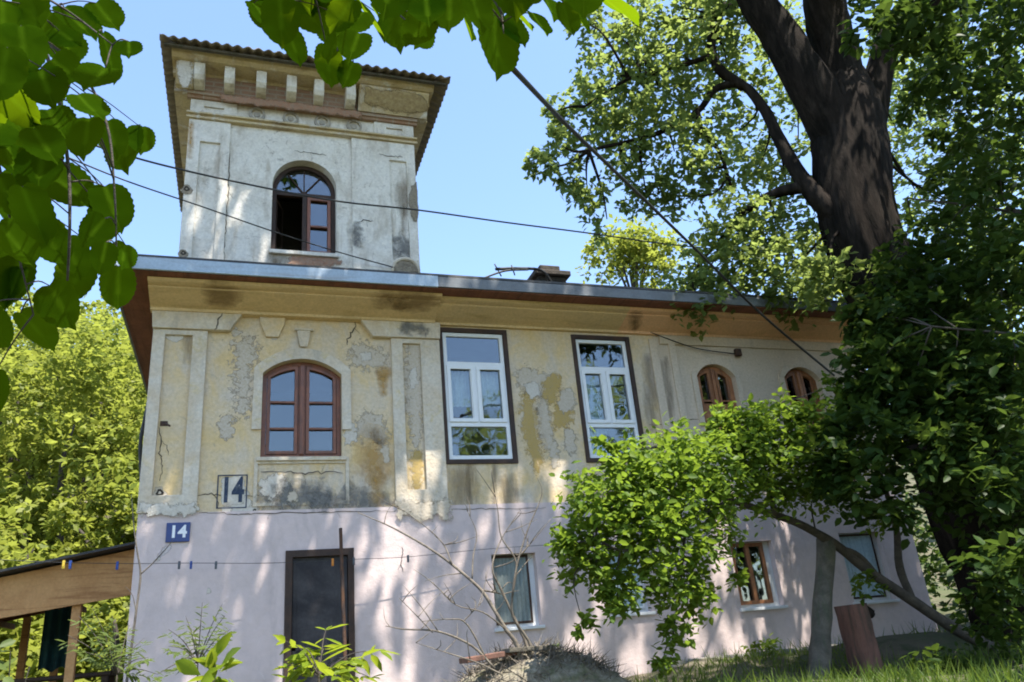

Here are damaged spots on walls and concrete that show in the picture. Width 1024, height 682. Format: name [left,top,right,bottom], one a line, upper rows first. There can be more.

crack [224,157,233,260]
peeling [216,336,277,441]
peeling [343,409,393,463]
peeling [395,344,453,524]
peeling [512,365,578,469]
spalling [138,486,199,518]